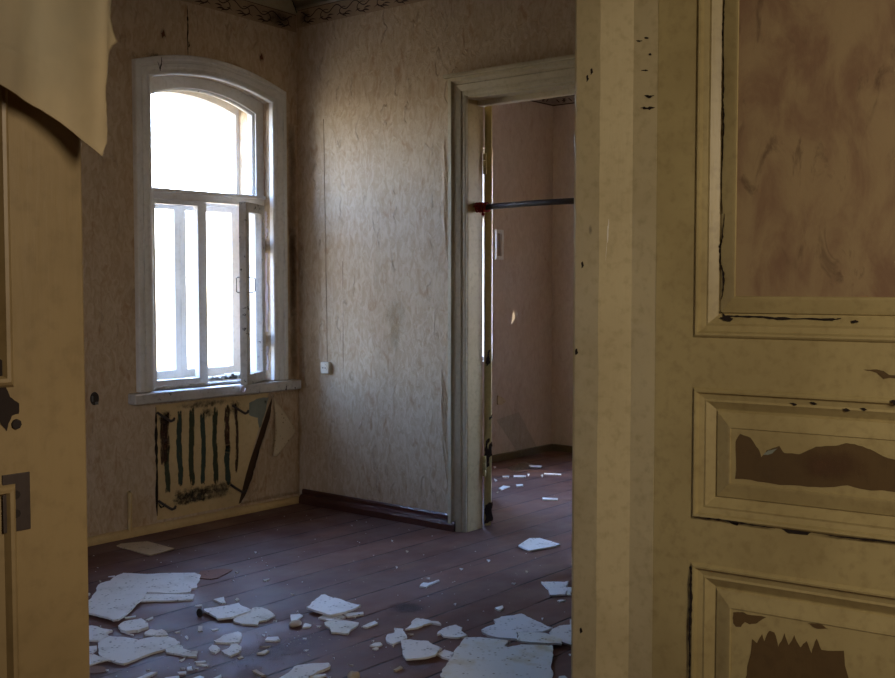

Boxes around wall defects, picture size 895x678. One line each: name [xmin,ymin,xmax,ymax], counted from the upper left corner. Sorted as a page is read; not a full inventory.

peeling [867,369,895,379]
peeling [156,393,269,520]
peeling [735,434,895,492]
peeling [733,612,766,627]
peeling [746,623,849,678]